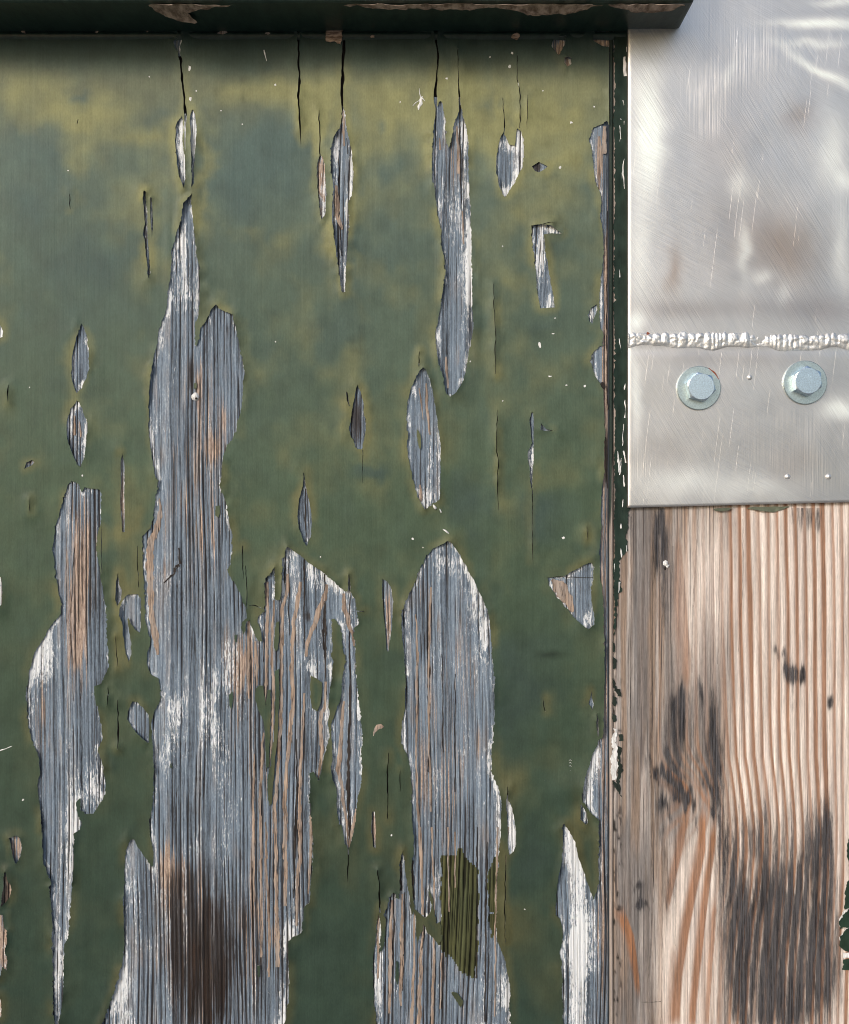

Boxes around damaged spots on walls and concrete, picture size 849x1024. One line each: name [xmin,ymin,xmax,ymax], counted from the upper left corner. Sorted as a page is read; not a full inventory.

crack [177,31,187,145]
crack [297,40,346,152]
crack [434,31,460,121]
peeling [496,124,561,197]
peeling [406,97,474,509]
peeling [531,222,561,308]
peeling [26,90,384,1024]
peeling [548,31,630,1024]
water stain [774,647,805,686]
peeling [372,538,516,1024]
water stain [653,683,843,1024]